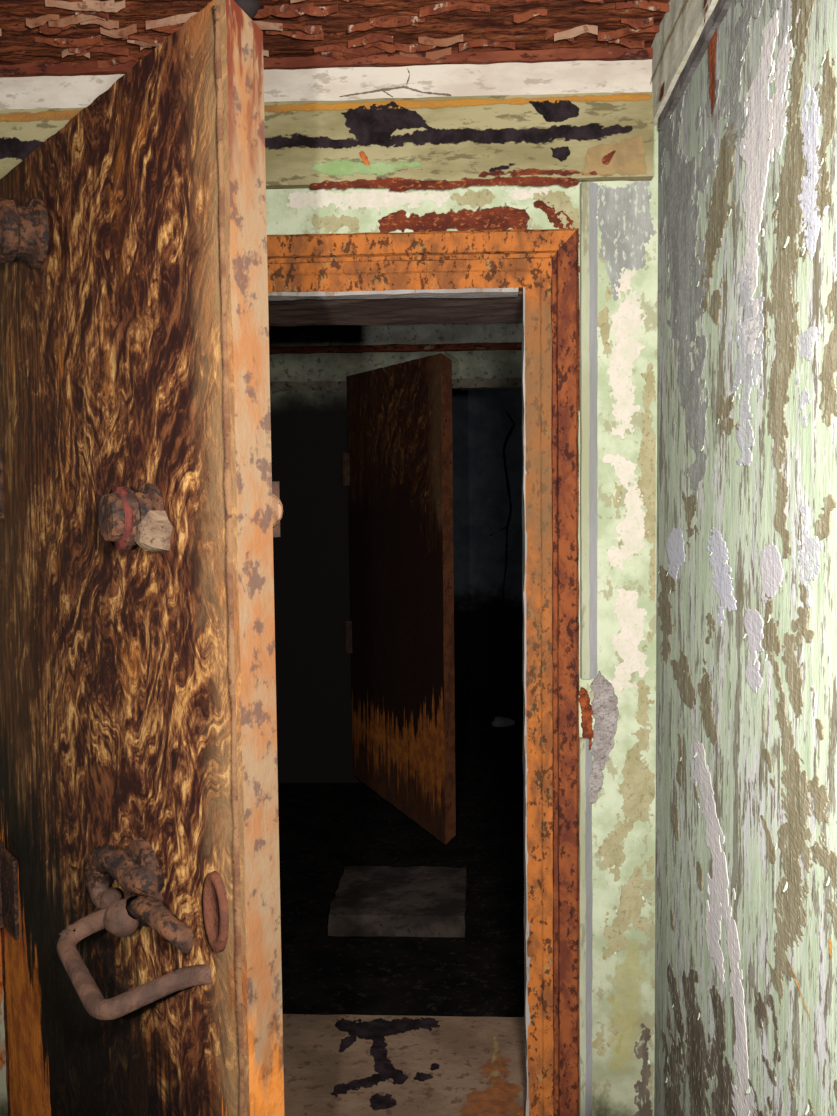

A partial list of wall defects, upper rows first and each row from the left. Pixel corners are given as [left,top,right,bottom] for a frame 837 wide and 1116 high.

peeling [579,0,837,1116]